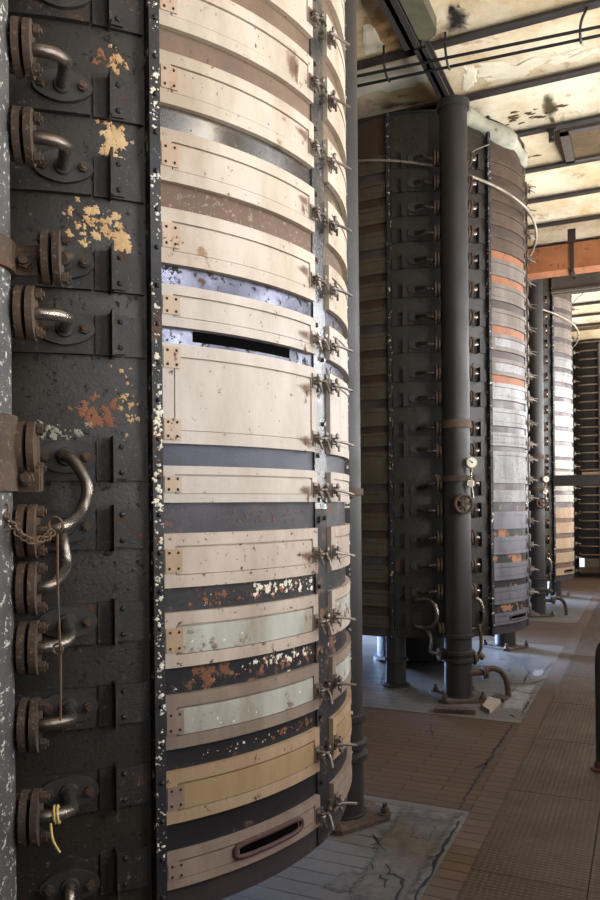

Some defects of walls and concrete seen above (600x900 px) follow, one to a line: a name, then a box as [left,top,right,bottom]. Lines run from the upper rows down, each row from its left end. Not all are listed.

peeling [91,44,129,77]
flaking render [461,48,600,91]
water stain [543,97,558,122]
peeling [95,119,134,158]
peeling [62,196,132,254]
rust [67,392,118,434]
peeling [187,577,313,607]
peeling [228,647,312,676]
crack [370,660,552,900]